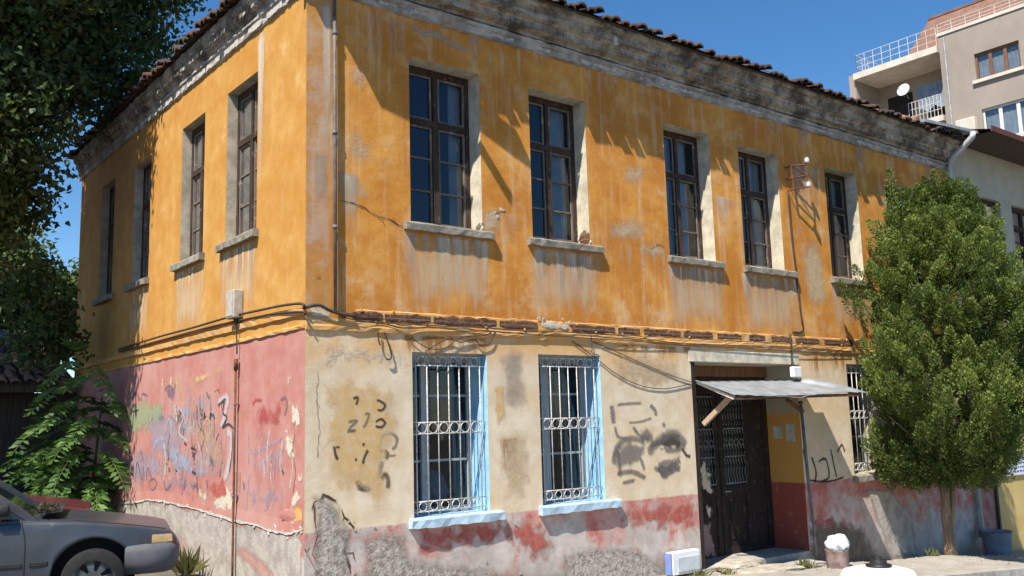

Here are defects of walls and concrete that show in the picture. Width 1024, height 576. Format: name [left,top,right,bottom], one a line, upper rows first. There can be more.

crack [342,200,403,227]
leakage [220,242,253,291]
leakage [405,233,488,295]
leakage [534,249,598,303]
leakage [669,266,721,314]
peeling [622,505,692,528]
peeling [420,524,548,558]